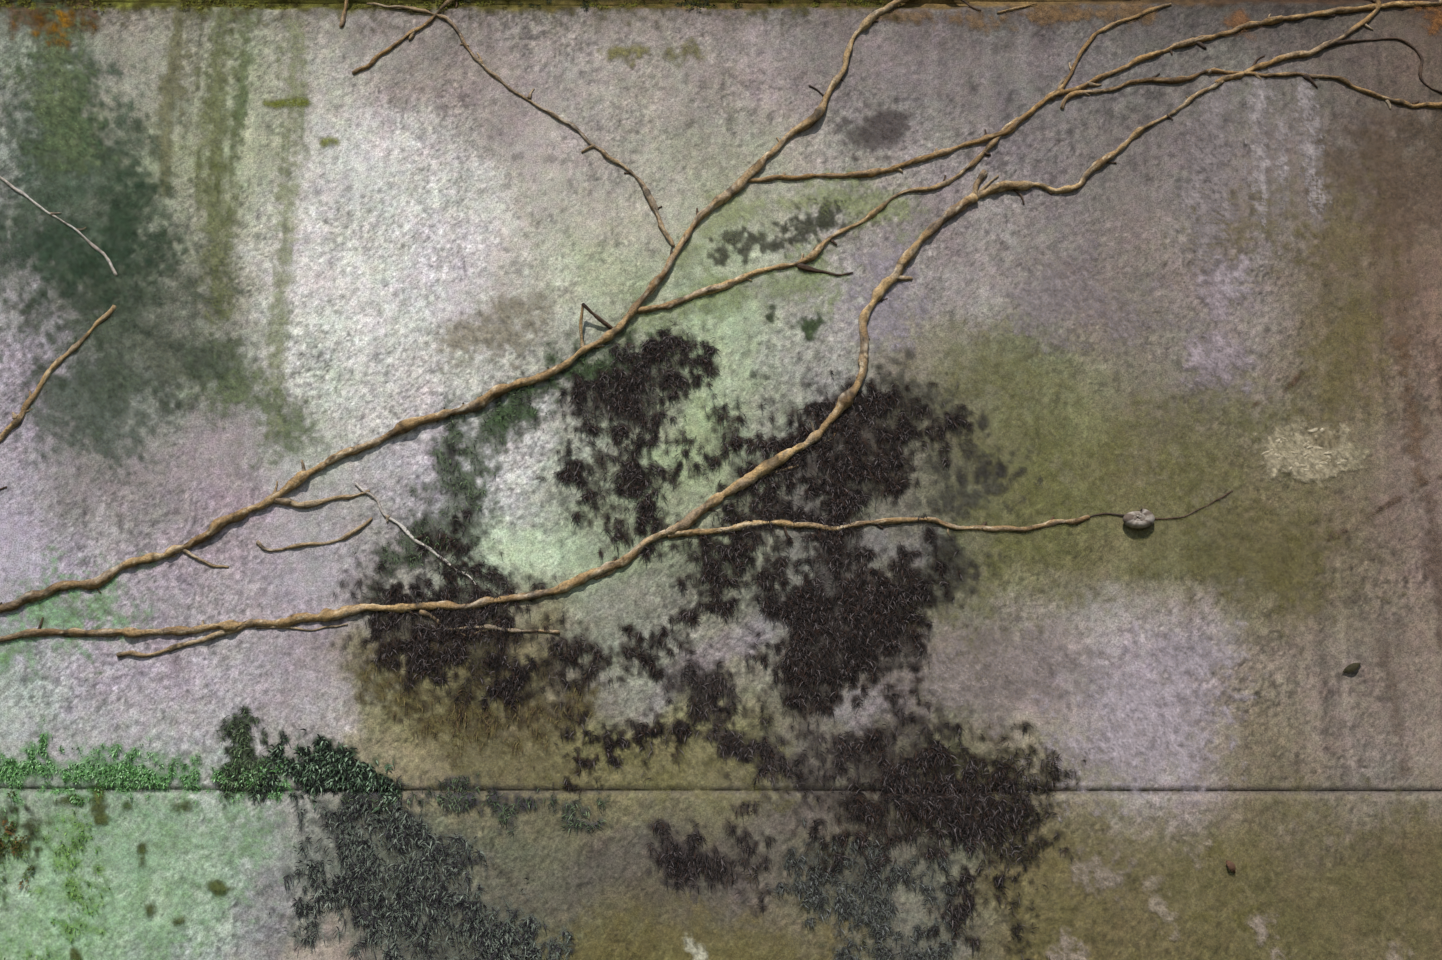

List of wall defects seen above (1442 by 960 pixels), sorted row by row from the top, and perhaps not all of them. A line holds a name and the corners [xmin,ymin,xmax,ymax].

damp [5,0,120,173]
damp [157,5,254,321]
damp [173,342,309,448]
damp [216,244,1248,960]
damp [1249,916,1281,959]